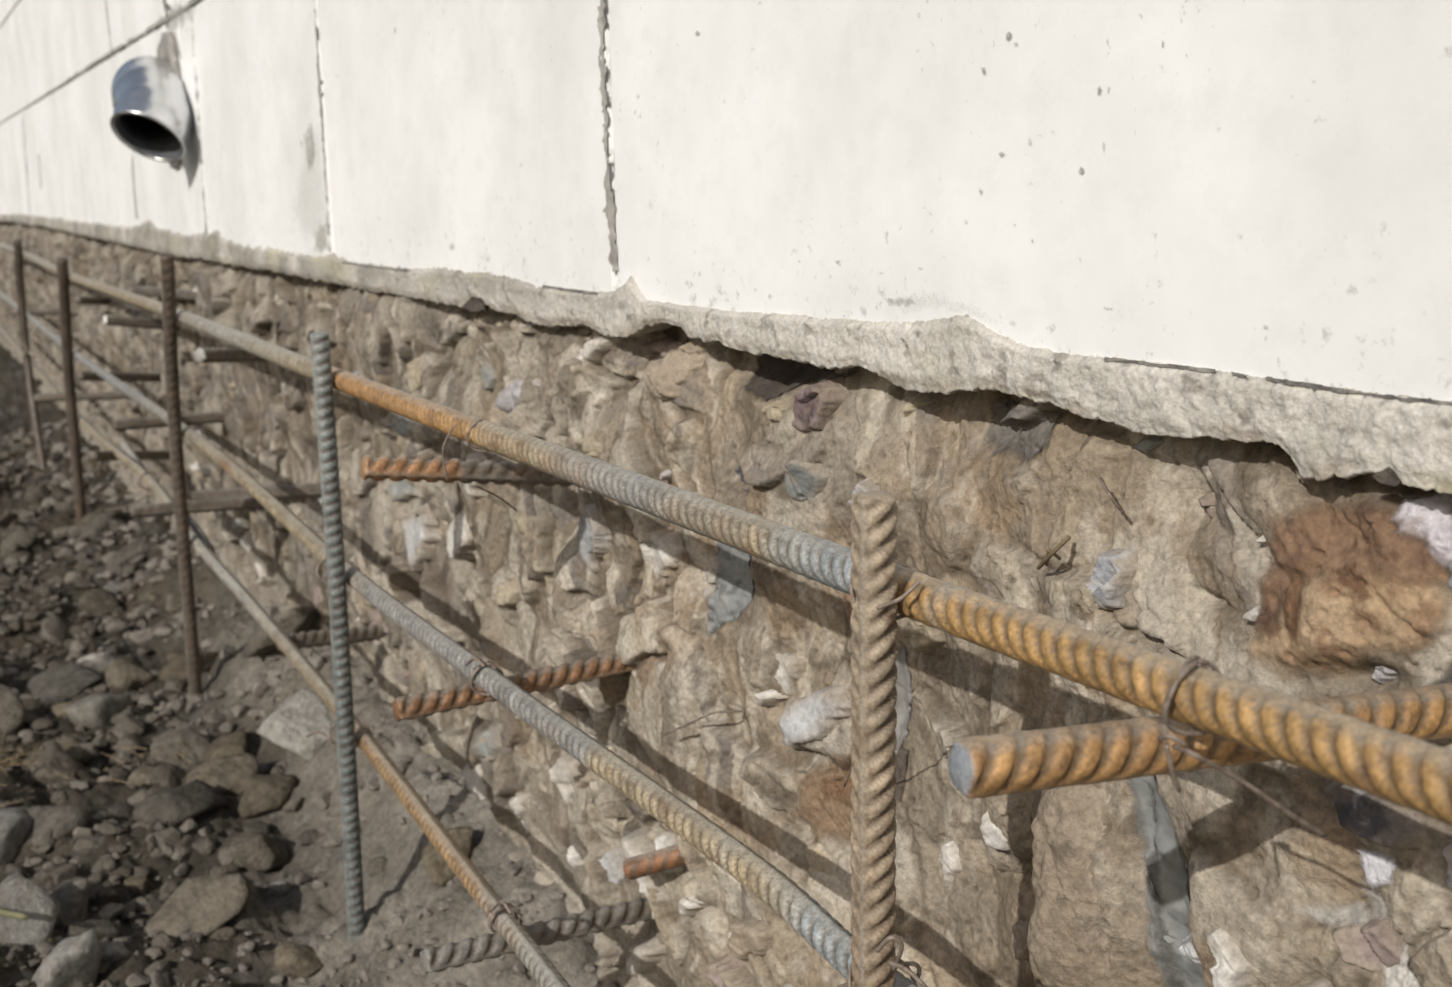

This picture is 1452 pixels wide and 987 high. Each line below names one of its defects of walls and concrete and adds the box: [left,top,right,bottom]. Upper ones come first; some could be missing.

spalling [0,239,1452,987]
corrosion [1250,503,1451,674]